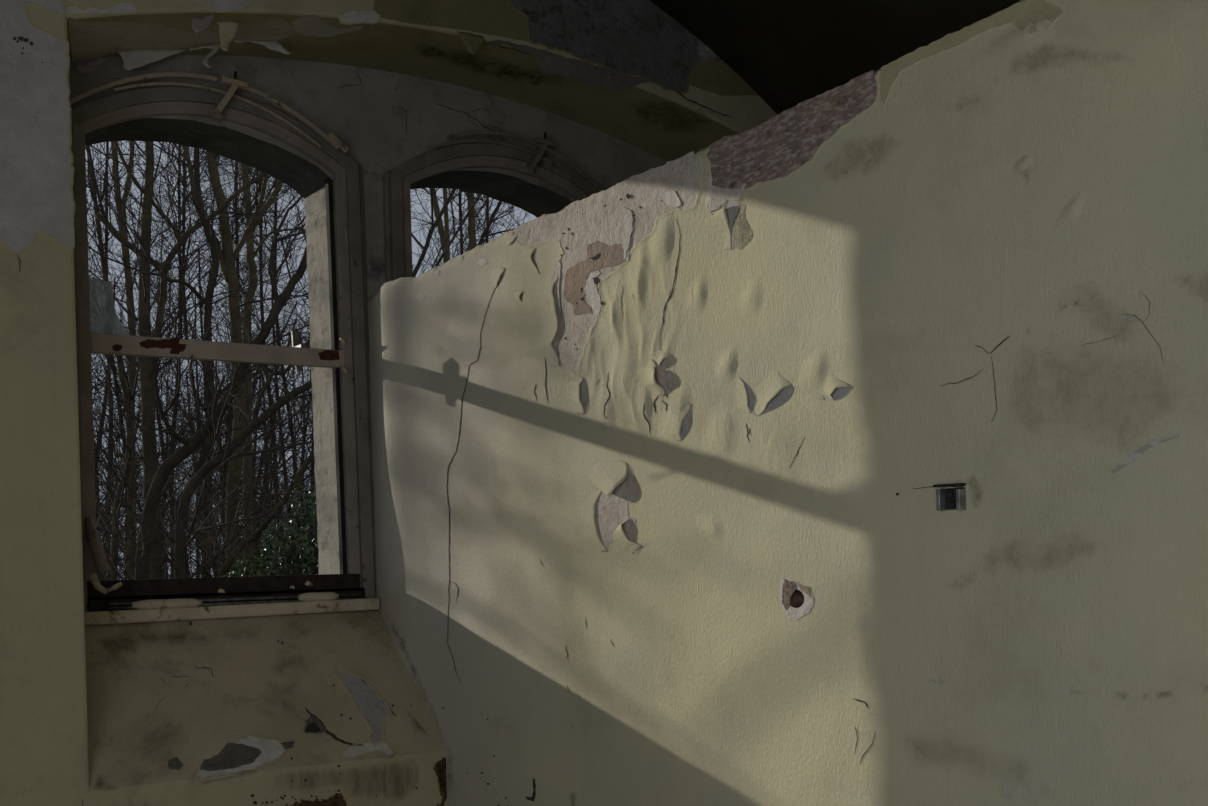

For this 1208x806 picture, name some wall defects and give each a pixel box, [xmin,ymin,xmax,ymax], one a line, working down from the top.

peeling [0,0,381,259]
flaking render [484,0,1065,416]
crack [942,336,1009,423]
crack [447,288,495,682]
peeling [585,460,628,496]
peeling [612,518,643,554]
spalling [782,579,796,609]
spalling [166,732,296,783]